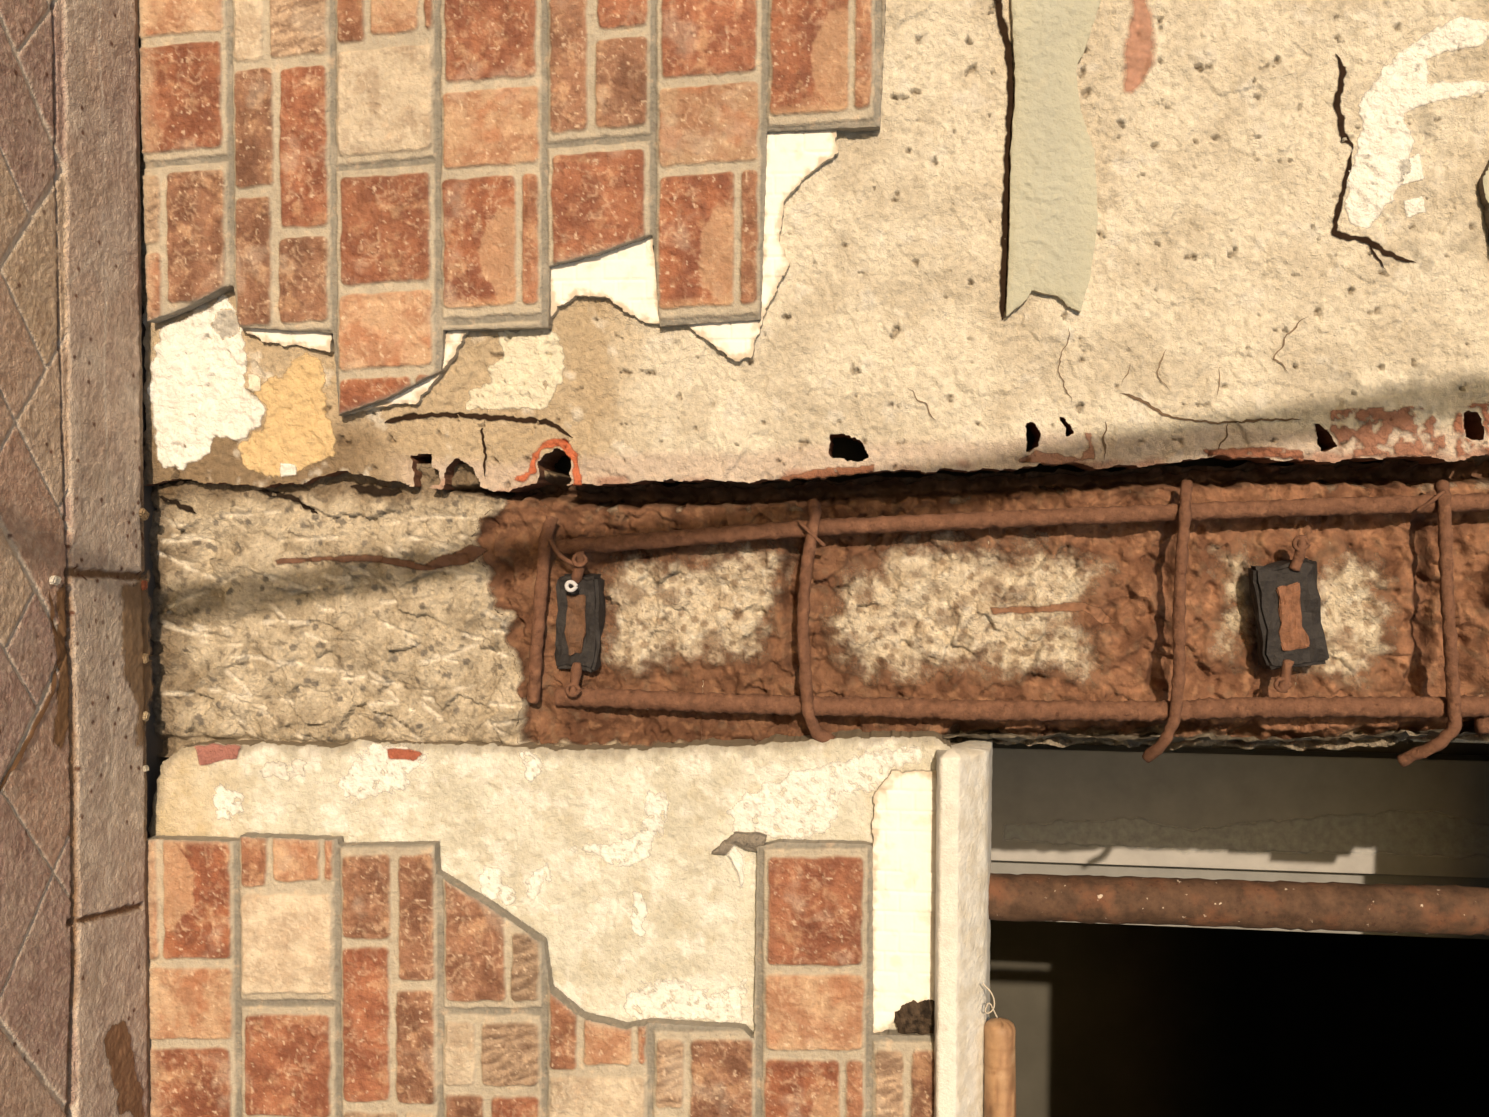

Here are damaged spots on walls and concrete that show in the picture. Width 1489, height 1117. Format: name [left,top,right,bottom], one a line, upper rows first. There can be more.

crack [995,0,1015,320]
peeling [1006,0,1101,317]
crack [1331,53,1416,269]
peeling [1345,16,1489,228]
crack [159,479,196,513]
crack [259,489,318,514]
crack [350,484,402,497]
spalling [147,294,1489,803]
rust [275,459,1489,747]
peeling [479,864,551,905]
peeling [727,746,922,885]
peeling [624,978,747,1022]